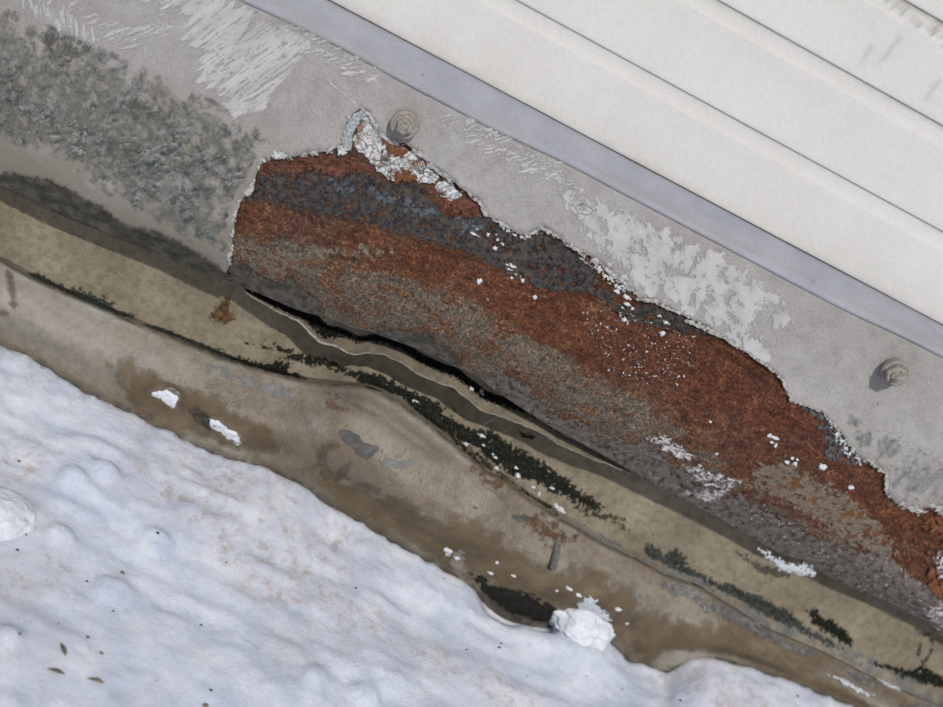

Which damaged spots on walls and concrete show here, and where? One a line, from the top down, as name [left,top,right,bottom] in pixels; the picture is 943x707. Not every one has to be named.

peeling [343,110,462,201]
damp [0,172,233,285]
rust [208,297,236,325]
damp [27,271,630,531]
peeling [338,430,415,471]
rust [227,108,943,635]
damp [317,443,868,707]
damp [873,659,943,690]